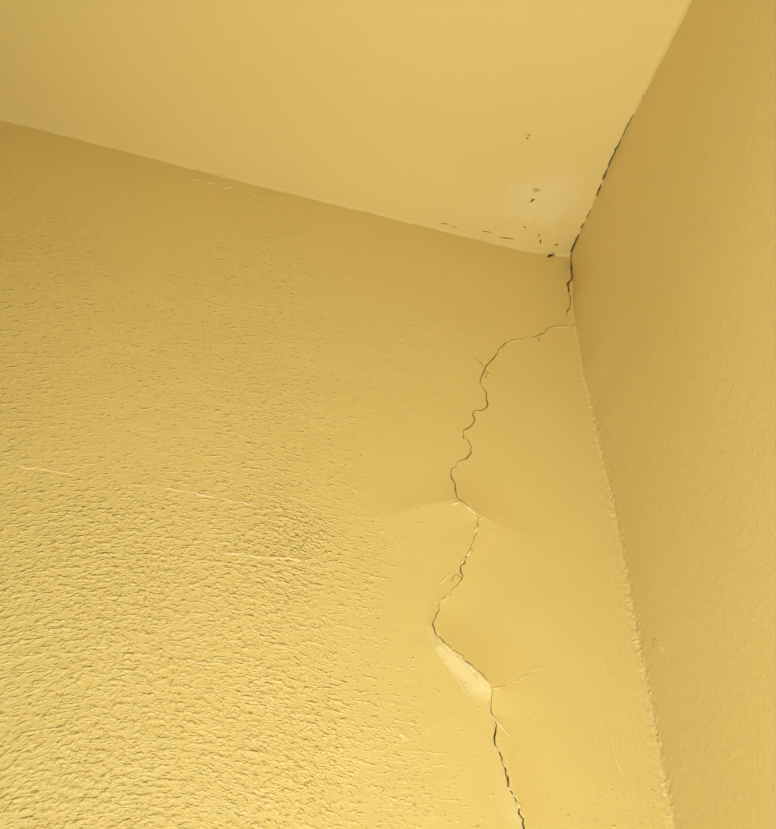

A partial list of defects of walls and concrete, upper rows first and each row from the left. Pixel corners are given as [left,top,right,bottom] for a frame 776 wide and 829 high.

crack [432,115,633,829]